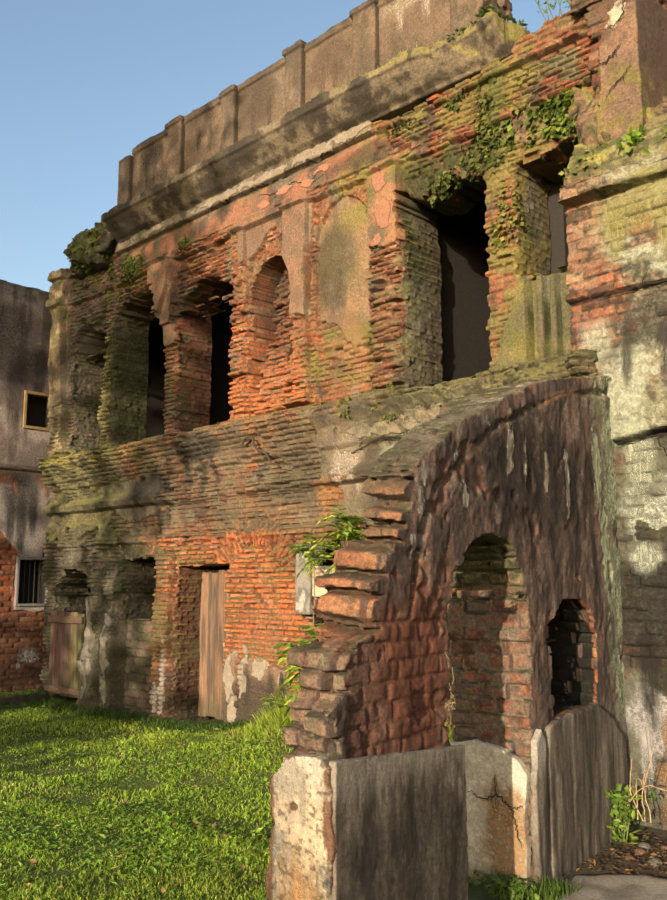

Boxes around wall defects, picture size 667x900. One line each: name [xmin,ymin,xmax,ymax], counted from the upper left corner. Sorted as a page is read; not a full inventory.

peeling [605,0,626,30]
peeling [126,121,372,245]
leakage [337,142,397,174]
leakage [611,289,667,380]
peeling [336,403,444,454]
leakage [5,476,38,551]
spalling [159,439,338,723]
crack [468,780,523,848]